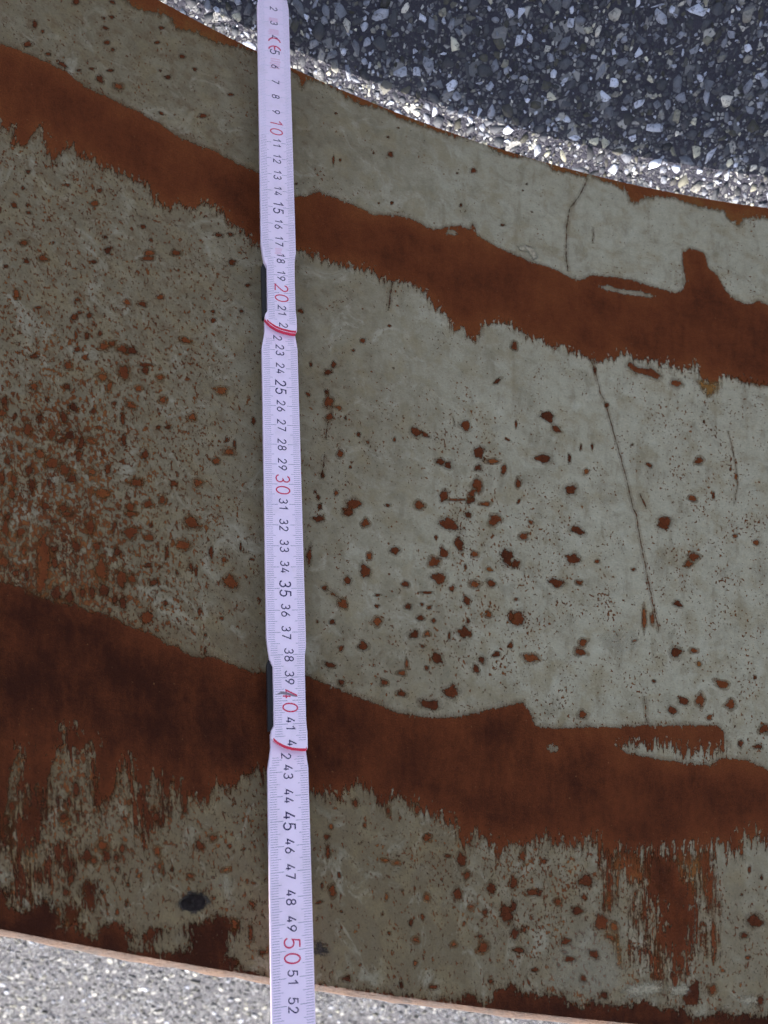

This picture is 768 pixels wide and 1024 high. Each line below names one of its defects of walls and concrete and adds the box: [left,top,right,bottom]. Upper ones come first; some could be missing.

corrosion [0,0,270,977]
corrosion [290,67,468,142]
corrosion [293,145,768,1024]
crack [566,183,586,269]